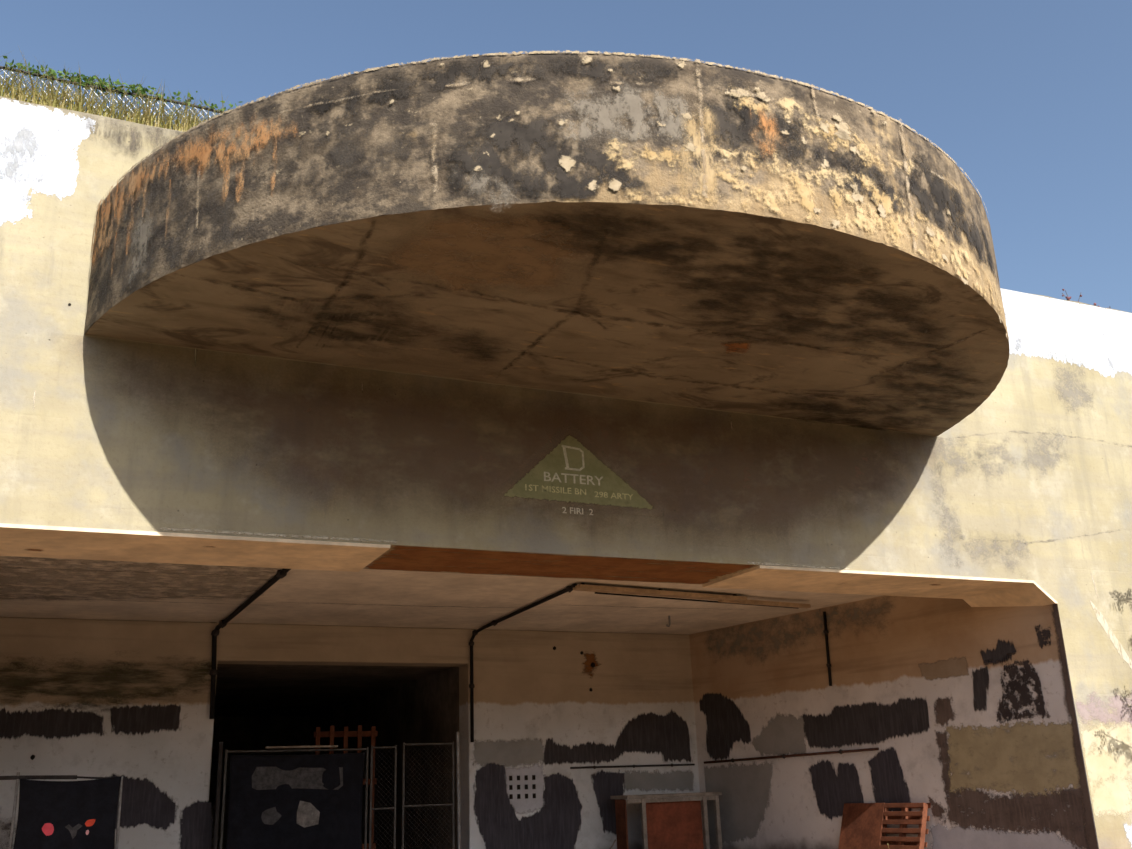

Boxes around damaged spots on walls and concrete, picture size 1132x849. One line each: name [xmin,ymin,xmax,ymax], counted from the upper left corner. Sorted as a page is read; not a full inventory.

peeling [0,98,96,226]
damp [90,126,167,152]
peeling [119,50,1132,378]
damp [310,54,995,274]
damp [191,209,977,529]
rust [582,653,601,676]